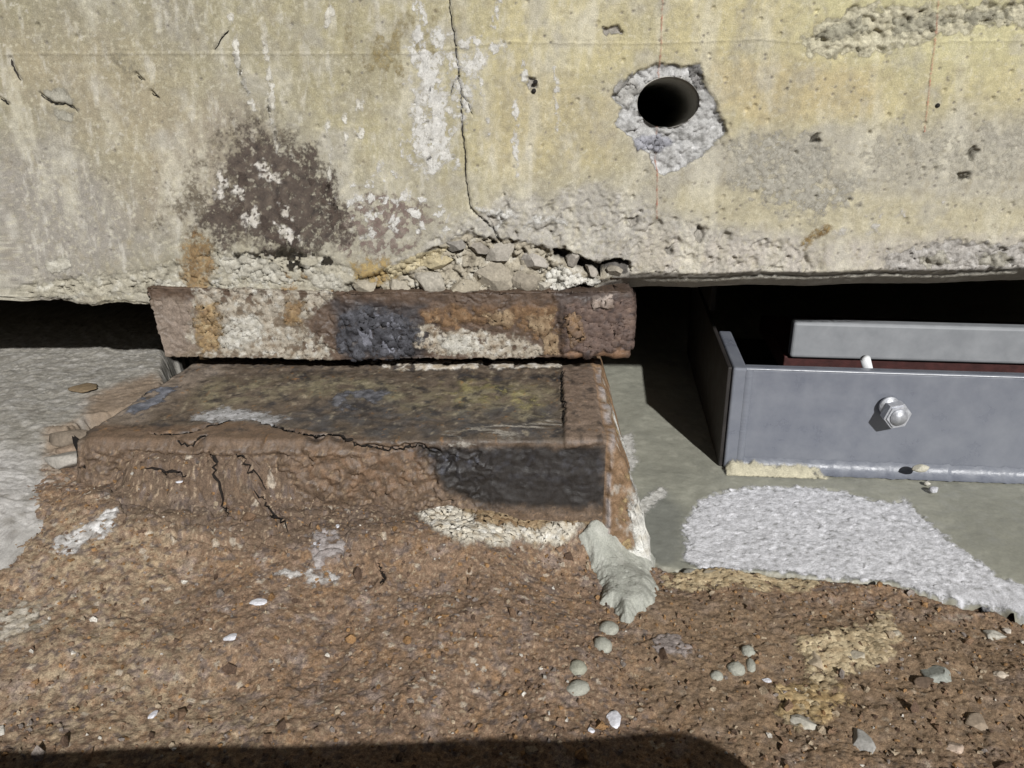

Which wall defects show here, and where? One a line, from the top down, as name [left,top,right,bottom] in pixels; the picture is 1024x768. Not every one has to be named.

leakage [324,5,335,28]
spalling [800,0,1024,60]
leakage [159,39,450,256]
crack [449,1,499,240]
spalling [612,64,861,218]
rust [176,231,216,288]
spalling [10,233,628,299]
rust [193,302,223,353]
rust [369,303,566,371]
crack [559,371,567,424]
crack [72,435,85,468]
crack [145,420,438,533]